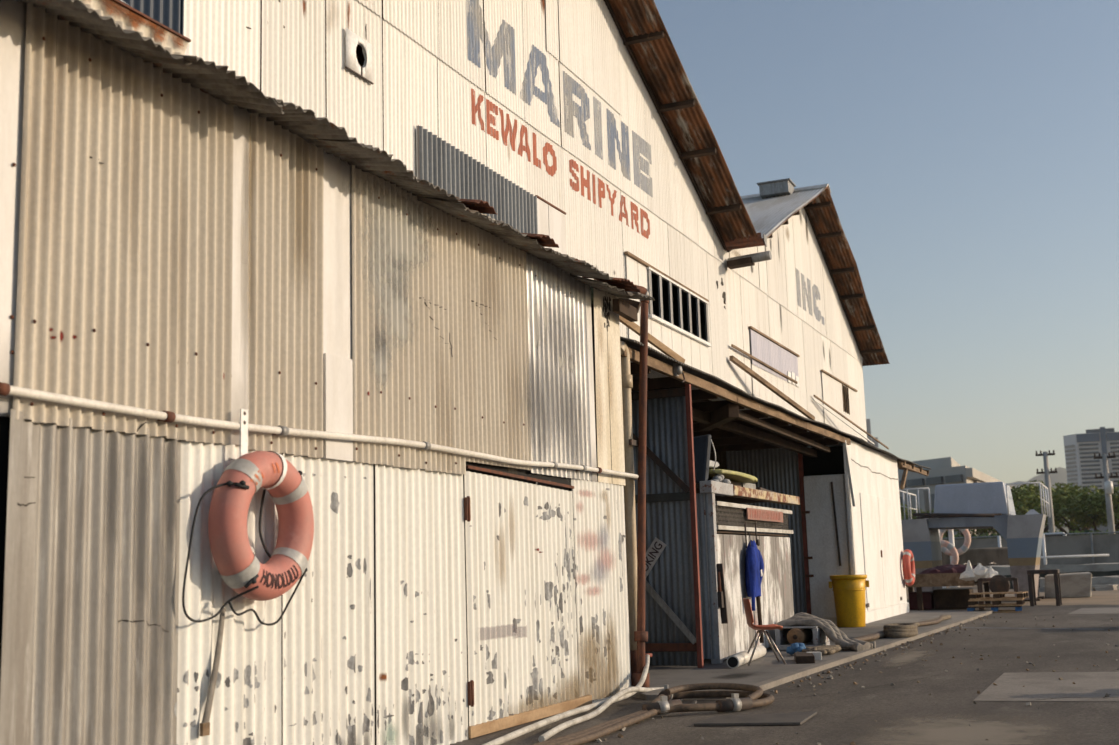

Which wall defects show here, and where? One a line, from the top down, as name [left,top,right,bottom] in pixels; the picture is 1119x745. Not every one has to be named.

rust [104,0,184,48]
leakage [364,184,429,383]
peeling [330,492,339,514]
peeling [347,555,371,599]
peeling [618,533,626,592]
peeling [401,496,611,745]
peeling [304,637,322,695]
peeling [347,656,363,673]
peeling [290,686,394,745]